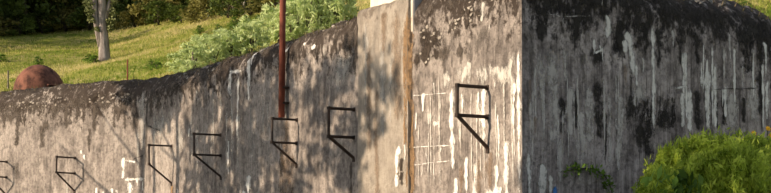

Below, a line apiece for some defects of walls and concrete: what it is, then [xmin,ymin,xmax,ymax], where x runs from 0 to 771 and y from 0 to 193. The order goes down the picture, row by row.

leakage [529,6,548,42]
leakage [1,115,25,145]
leakage [80,107,98,160]
leakage [395,144,406,187]